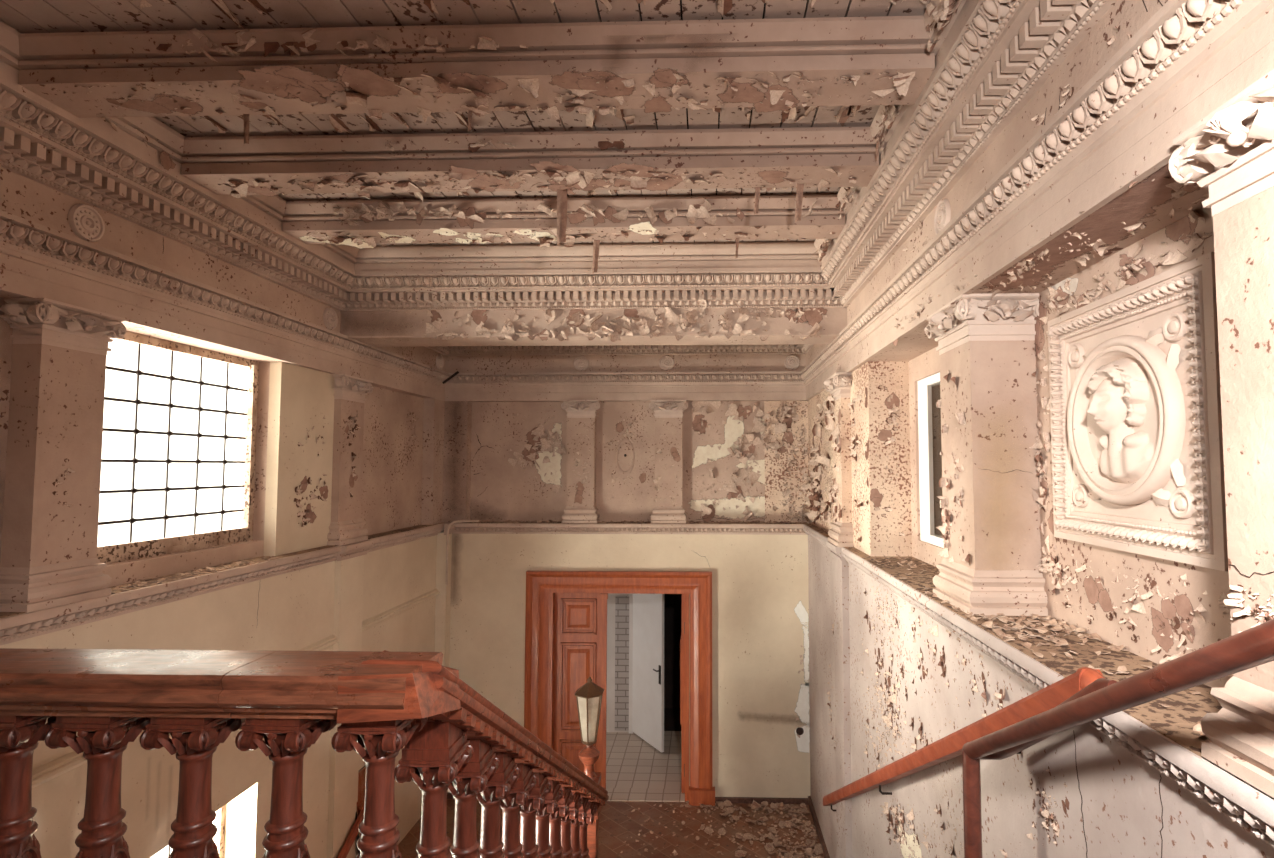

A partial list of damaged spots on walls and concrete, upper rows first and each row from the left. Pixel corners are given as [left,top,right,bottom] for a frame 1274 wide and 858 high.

peeling [39,0,916,274]
peeling [422,298,828,342]
peeling [294,474,328,527]
peeling [342,410,361,497]
peeling [507,413,593,506]
peeling [608,385,905,536]
peeling [893,163,1274,664]
peeling [794,601,810,753]
peeling [857,586,1005,774]
peeling [880,801,963,858]
crack [1073,730,1087,857]